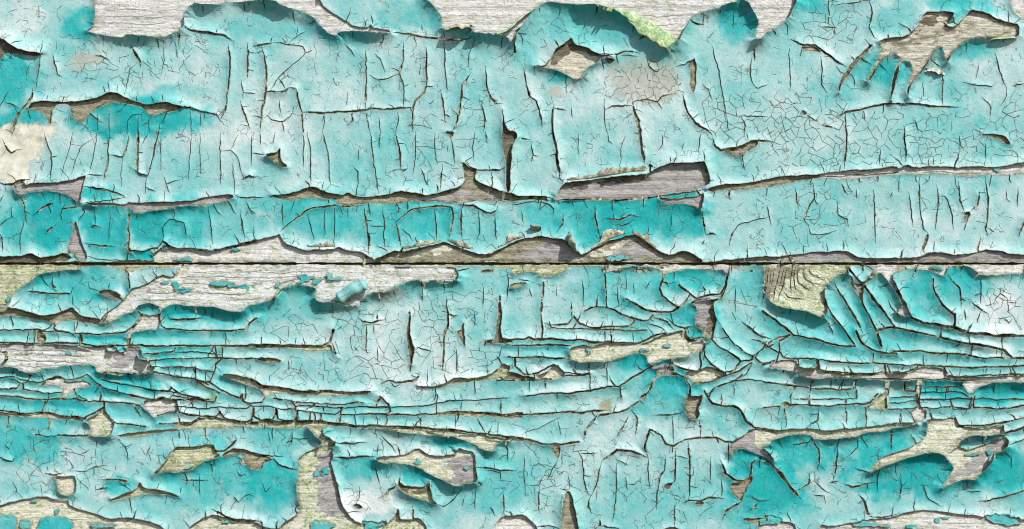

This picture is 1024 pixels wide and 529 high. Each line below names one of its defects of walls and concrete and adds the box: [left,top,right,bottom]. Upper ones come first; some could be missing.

peeling [87,0,250,49]
peeling [534,38,614,82]
peeling [428,0,797,53]
peeling [836,0,1024,94]
crack [0,0,1024,304]
peeling [272,110,1024,213]
peeling [0,168,1024,529]
crack [949,277,1021,329]
crack [263,269,942,529]
crack [0,439,151,499]
crack [180,421,401,529]
crack [967,439,1024,502]